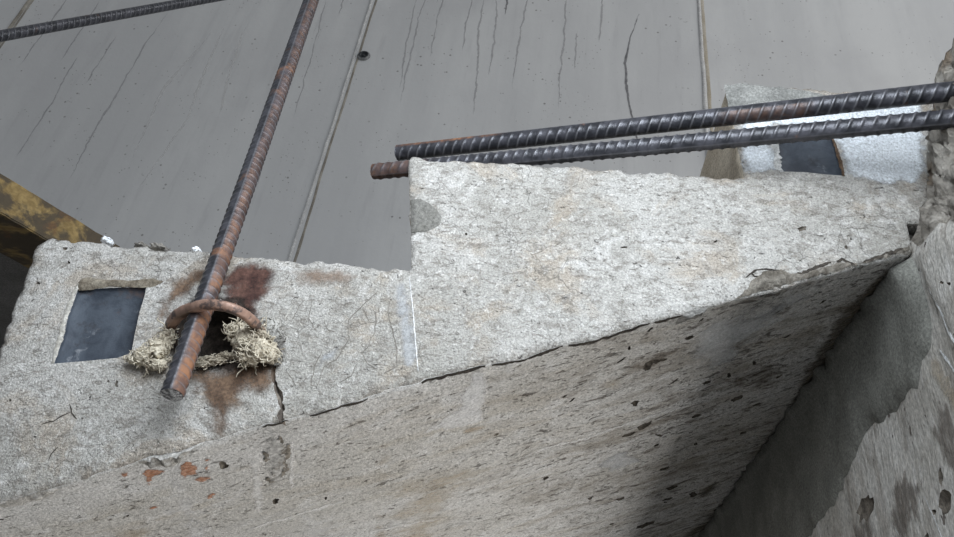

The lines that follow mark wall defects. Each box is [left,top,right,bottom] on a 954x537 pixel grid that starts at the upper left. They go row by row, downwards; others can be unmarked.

crack [623,20,637,138]
rust [170,270,204,300]
rust [223,265,273,317]
crack [263,291,398,428]
rust [192,362,271,433]